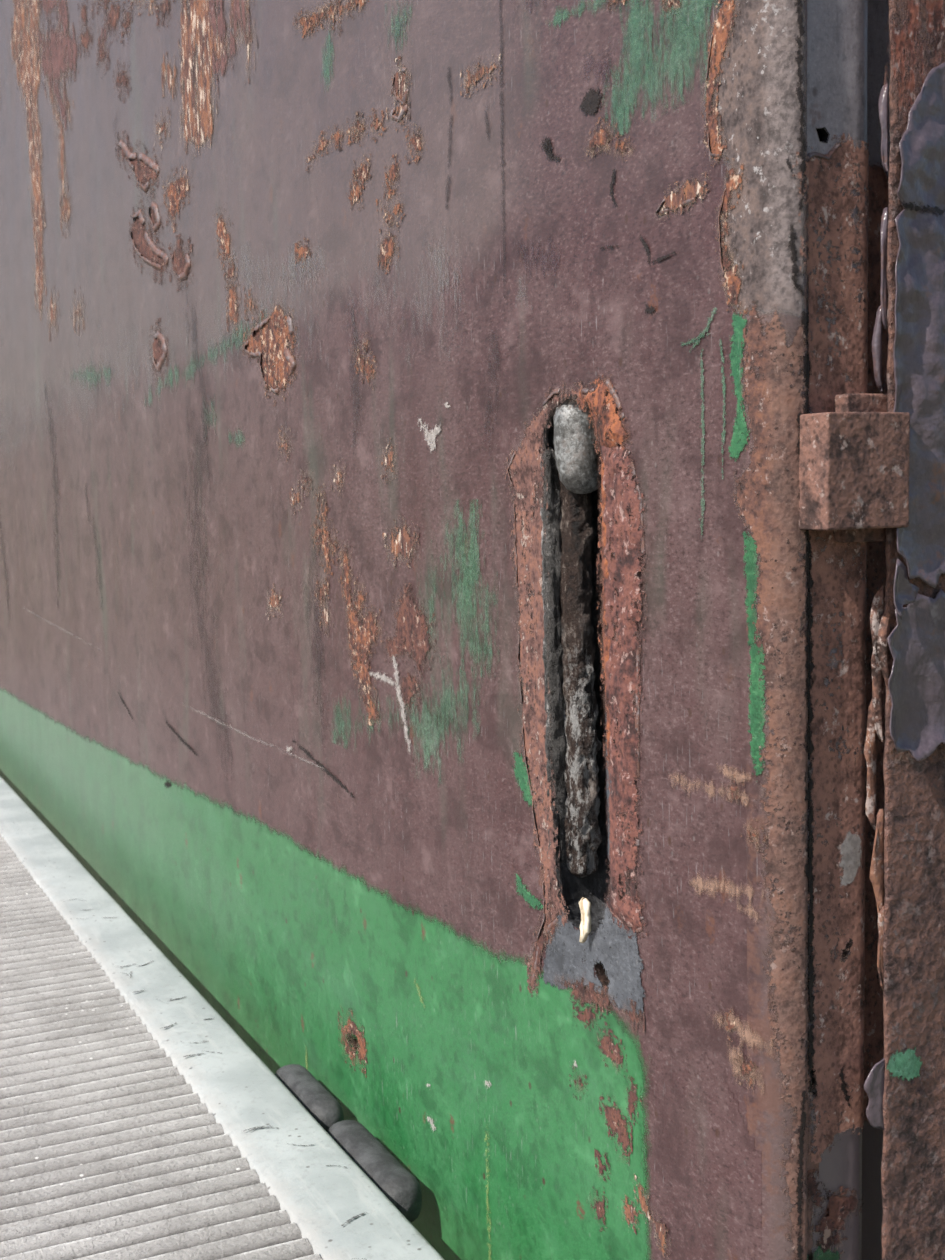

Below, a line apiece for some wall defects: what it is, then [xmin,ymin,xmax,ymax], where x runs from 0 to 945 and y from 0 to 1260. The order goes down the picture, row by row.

rust [11,0,257,341]
rust [346,55,427,274]
peeling [655,172,711,224]
rust [291,460,436,731]
rust [503,370,648,997]
rust [675,0,945,1260]
rust [338,1009,368,1074]